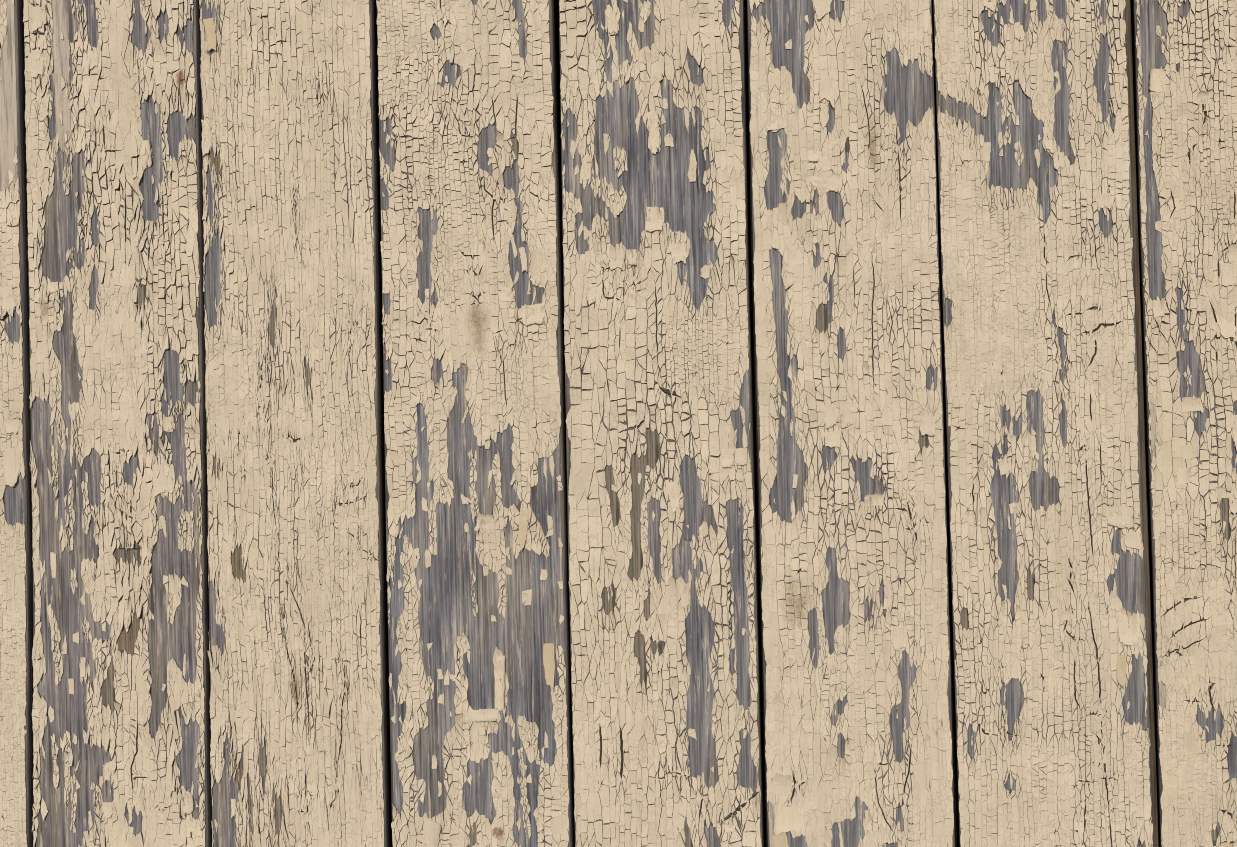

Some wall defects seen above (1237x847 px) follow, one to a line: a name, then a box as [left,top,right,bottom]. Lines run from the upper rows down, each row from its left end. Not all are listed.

peeling [0,0,287,847]
crack [601,249,678,396]
peeling [562,0,723,316]
peeling [751,0,887,541]
peeling [879,0,1115,225]
crack [1044,234,1121,365]
crack [1210,192,1237,362]
crack [283,589,346,813]
peeling [388,341,588,847]
crack [599,727,623,778]
peeling [596,401,922,847]
crack [1064,394,1113,847]